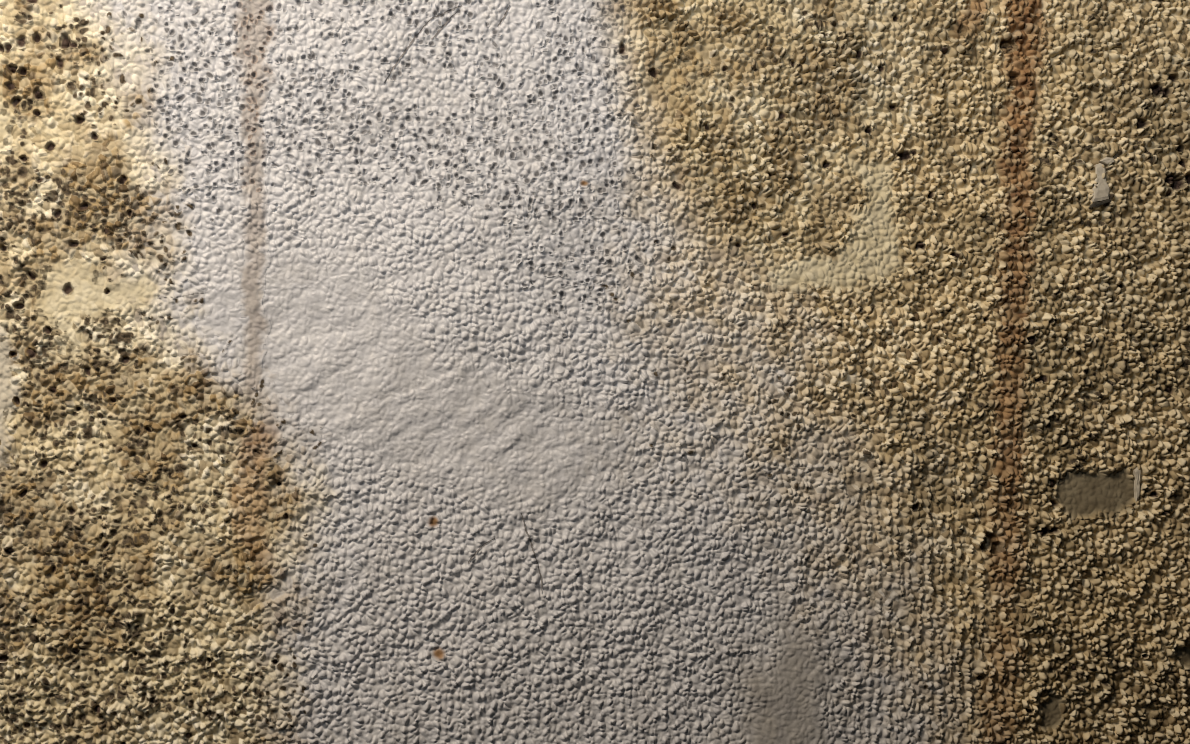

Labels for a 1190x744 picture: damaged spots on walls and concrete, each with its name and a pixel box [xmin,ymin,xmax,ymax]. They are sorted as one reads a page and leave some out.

water stain [228,0,310,40]
water stain [310,0,474,81]
water stain [473,22,514,80]
water stain [536,0,563,23]
water stain [205,176,262,222]
water stain [304,163,324,196]
water stain [1037,125,1157,285]
corrosion [948,0,1056,744]
spalling [1035,374,1049,384]
water stain [1034,312,1190,470]
spalling [1038,465,1171,538]
spalling [1172,644,1190,670]